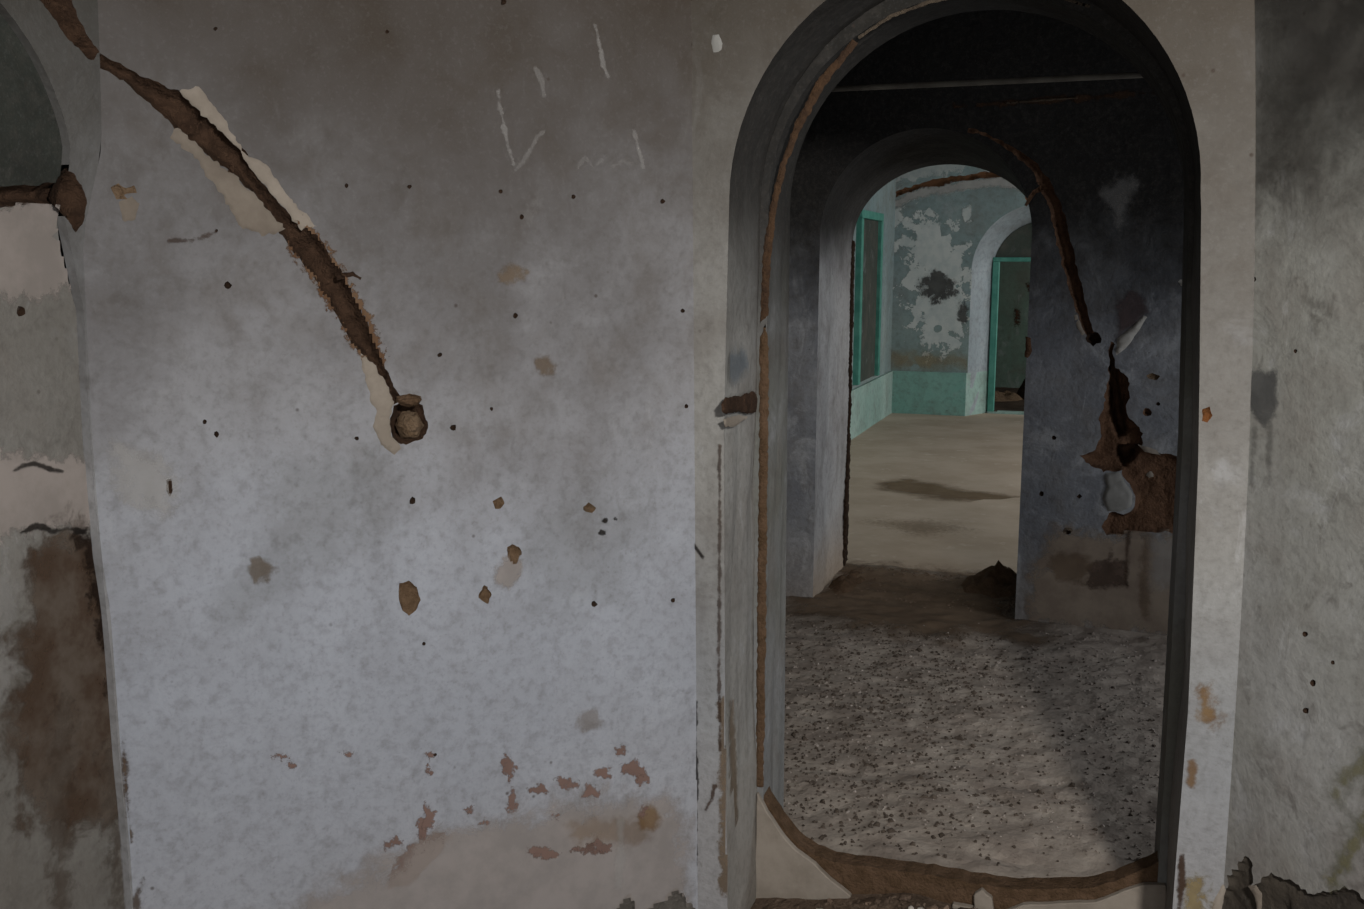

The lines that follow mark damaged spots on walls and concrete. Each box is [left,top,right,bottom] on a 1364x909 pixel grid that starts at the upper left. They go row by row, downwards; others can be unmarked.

crack [40,0,400,418]
peeling [896,164,965,189]
crack [895,128,1102,346]
peeling [893,199,972,365]
spalling [721,0,946,787]
spalling [1080,291,1177,535]
peeling [500,744,650,812]
peeling [384,801,445,879]
peeling [528,838,612,860]
spalling [617,890,696,909]
spalling [1212,856,1364,909]